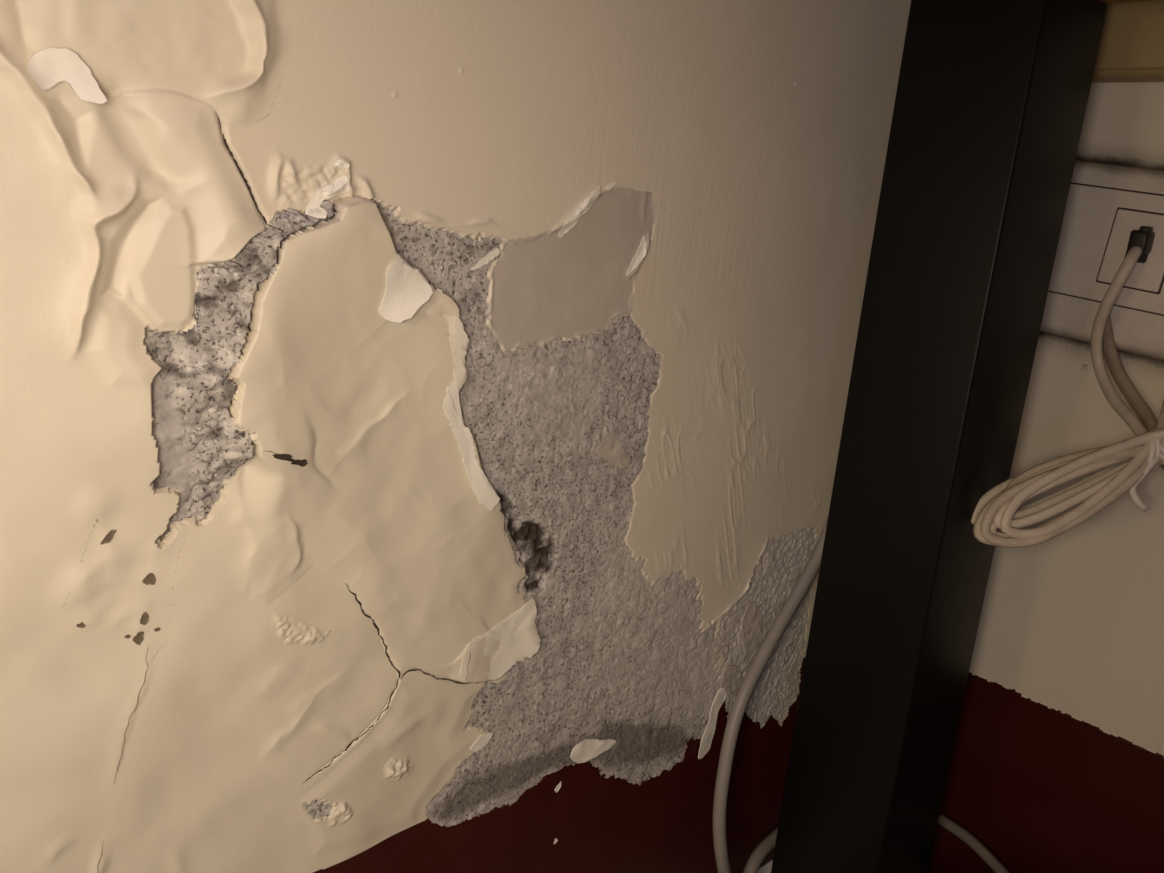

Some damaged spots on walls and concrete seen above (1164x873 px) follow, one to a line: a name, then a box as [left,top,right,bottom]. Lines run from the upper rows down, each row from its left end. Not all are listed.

flaking render [61,94,818,860]
crack [114,649,148,781]
crack [302,584,478,785]